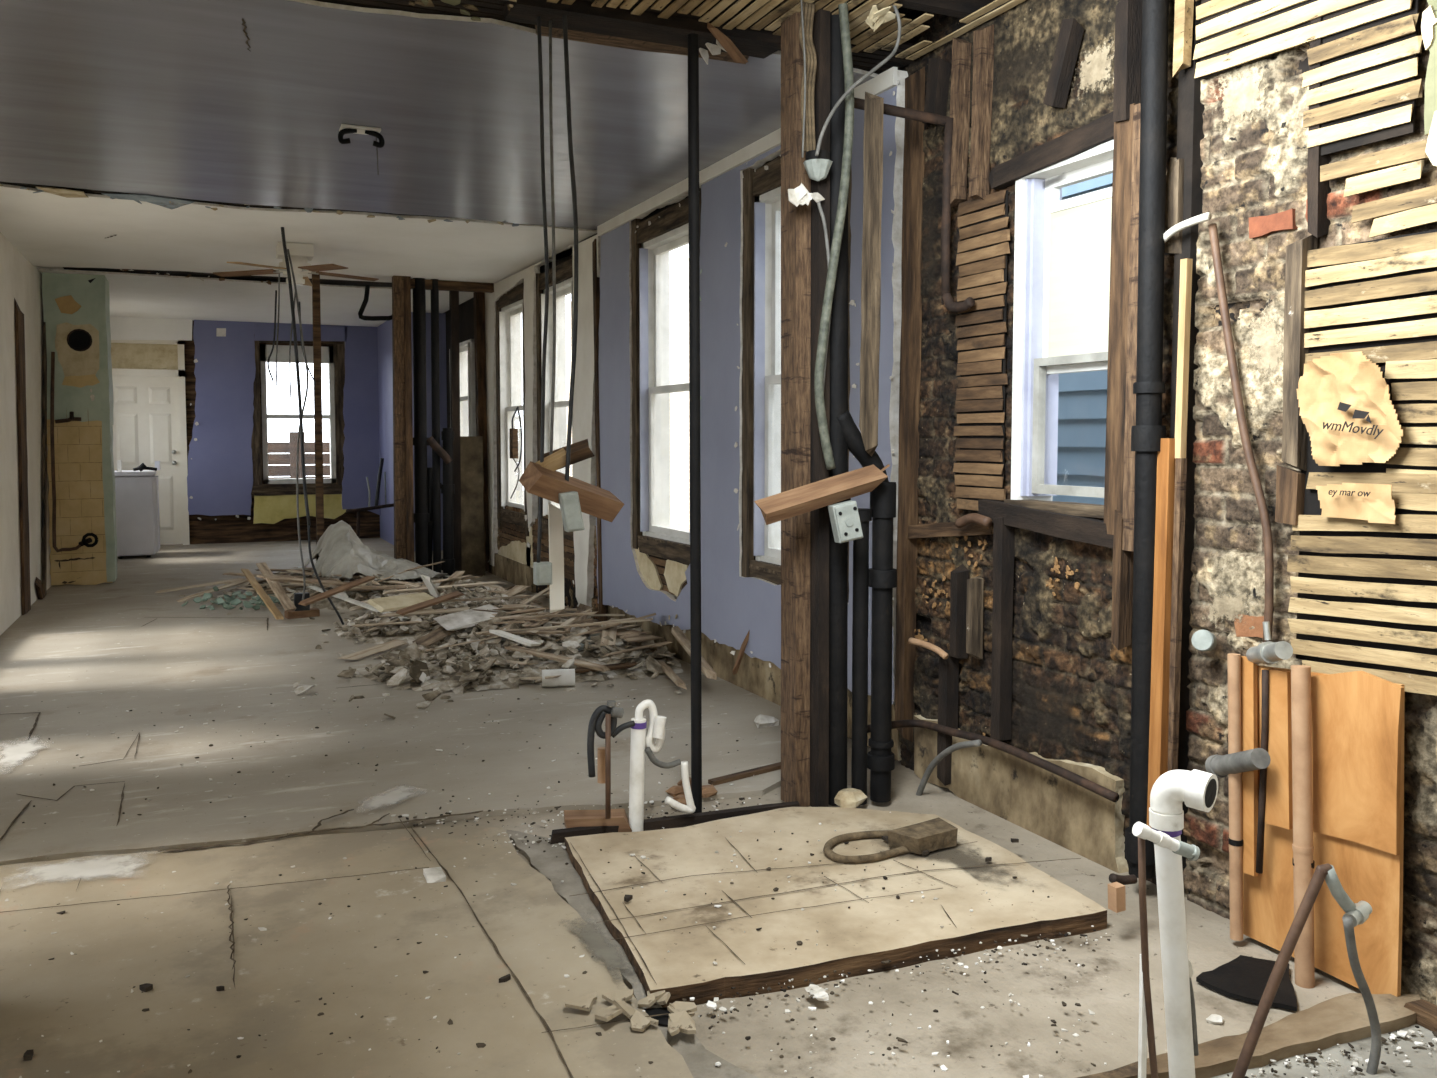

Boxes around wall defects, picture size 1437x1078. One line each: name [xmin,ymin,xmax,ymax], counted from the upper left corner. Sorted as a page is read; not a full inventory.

spalling [409,0,481,21]
flaking render [1166,0,1179,176]
flaking render [865,0,1133,868]
flaking render [1162,253,1174,438]
flaking render [1183,0,1437,920]
flaking render [1401,692,1437,1005]